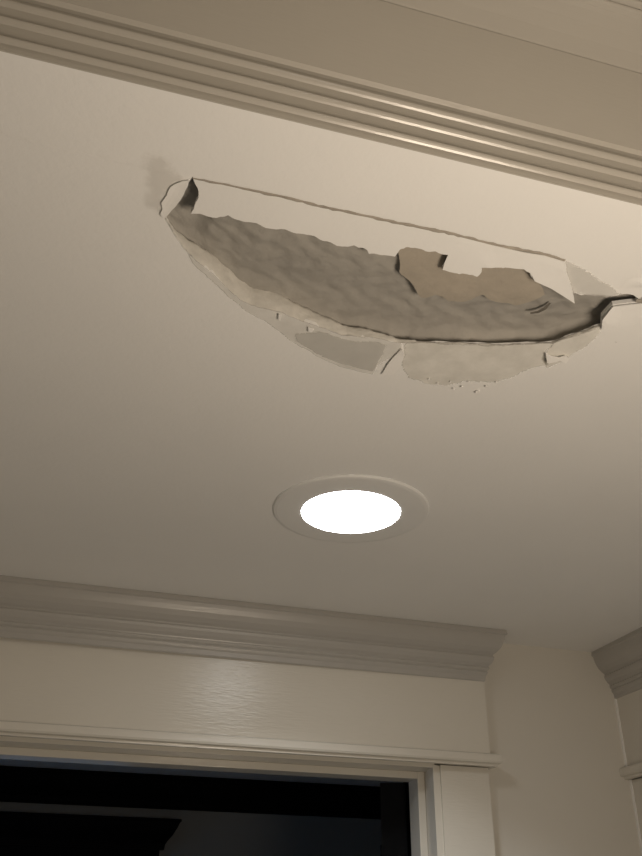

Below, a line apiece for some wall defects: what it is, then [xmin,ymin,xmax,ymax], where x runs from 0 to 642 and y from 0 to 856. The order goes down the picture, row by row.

peeling [403,228,575,303]
peeling [602,303,642,330]